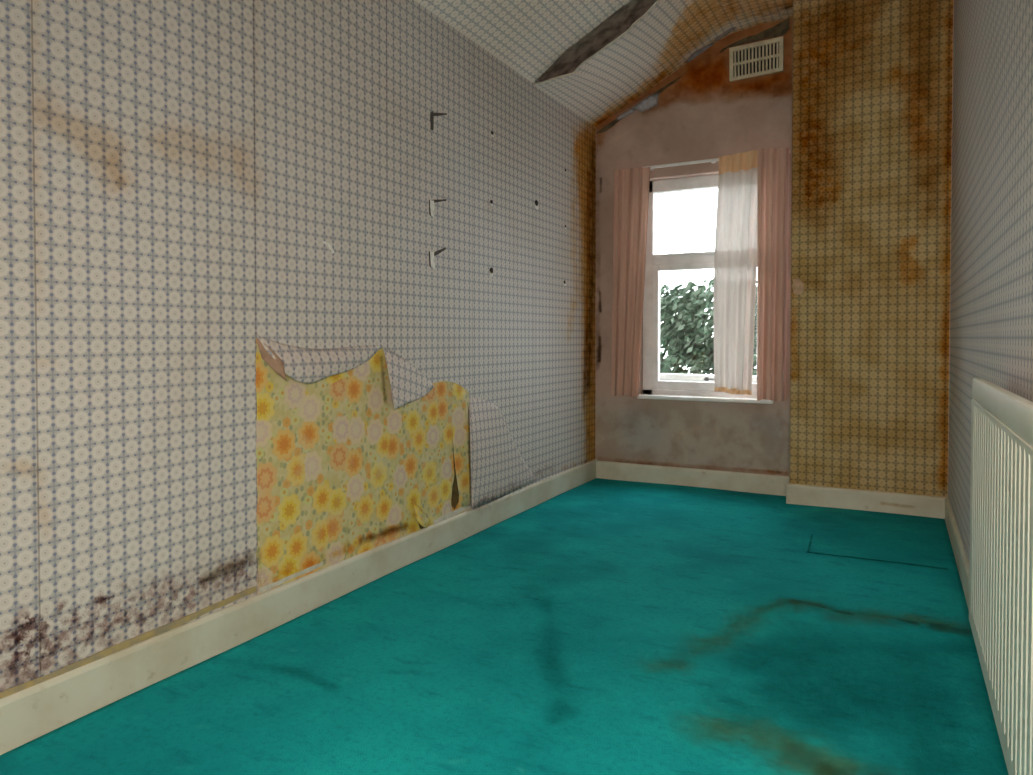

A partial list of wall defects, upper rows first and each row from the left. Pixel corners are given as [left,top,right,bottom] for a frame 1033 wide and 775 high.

crack [537,0,657,82]